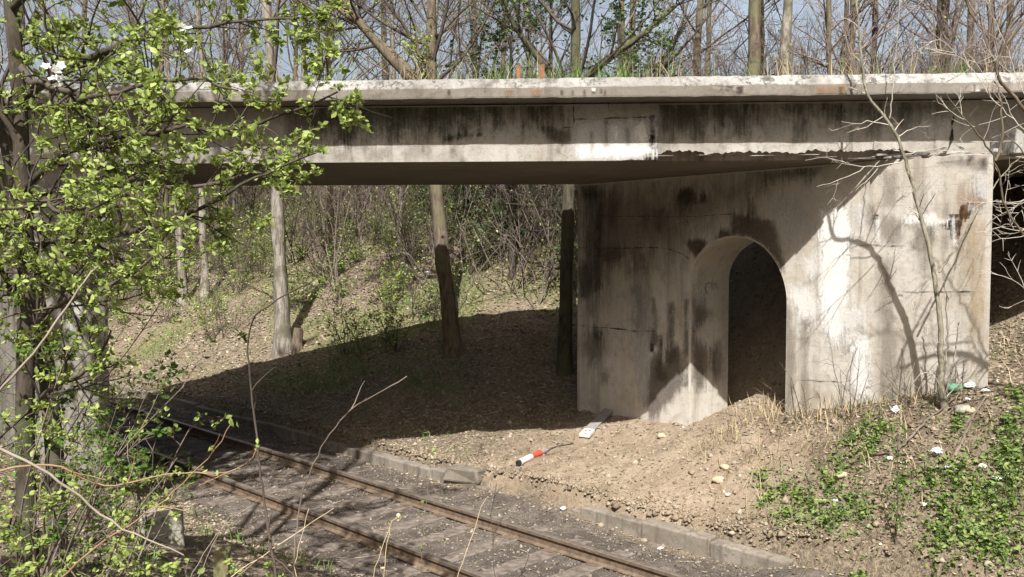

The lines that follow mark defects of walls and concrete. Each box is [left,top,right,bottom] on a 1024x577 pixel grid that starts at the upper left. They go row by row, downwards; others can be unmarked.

leakage [295,106,501,143]
leakage [548,118,654,160]
spalling [622,148,1002,207]
leakage [688,201,784,270]
leakage [647,301,707,415]